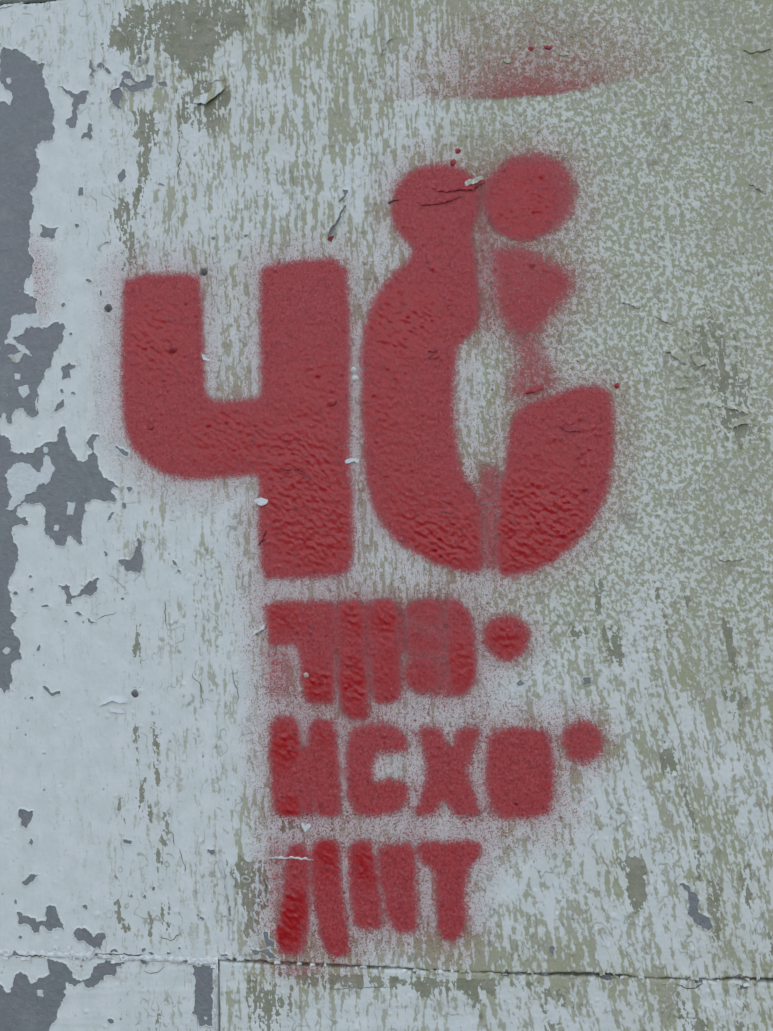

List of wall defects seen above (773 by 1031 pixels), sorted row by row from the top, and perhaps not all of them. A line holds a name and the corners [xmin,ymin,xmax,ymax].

peeling [0,45,170,696]
peeling [0,871,128,1031]
peeling [139,928,327,1031]
peeling [677,879,717,934]